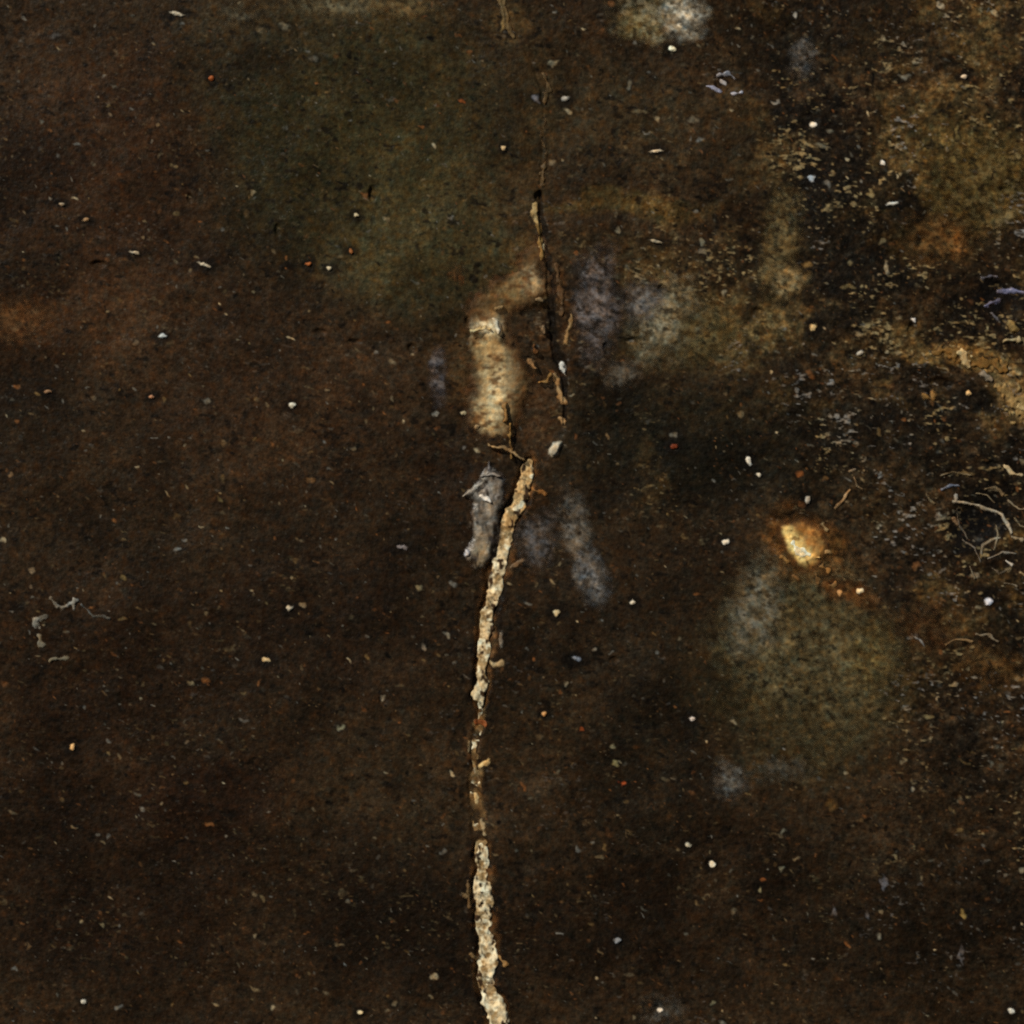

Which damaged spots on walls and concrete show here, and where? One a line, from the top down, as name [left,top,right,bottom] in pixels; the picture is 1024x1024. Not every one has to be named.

crack [497,0,515,39]
crack [463,72,573,1024]
damp [726,570,880,736]
rust [824,581,864,600]